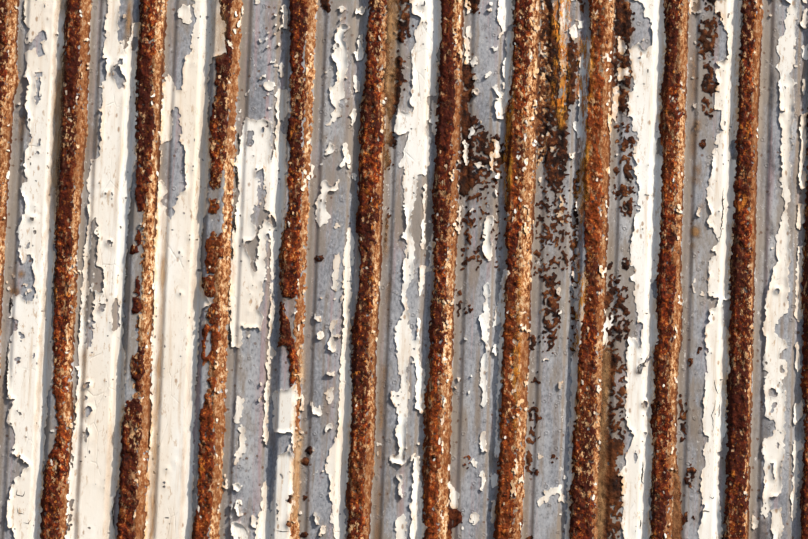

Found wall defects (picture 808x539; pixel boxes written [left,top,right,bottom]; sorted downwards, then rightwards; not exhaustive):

peeling [6,0,78,539]
corrosion [40,0,92,539]
corrosion [116,0,168,539]
peeling [65,0,366,539]
corrosion [345,0,414,539]
peeling [380,0,451,539]
corrosion [421,0,639,539]
peeling [601,0,674,539]
corrosion [649,0,723,539]
peeling [691,0,742,539]
corrosion [722,0,764,539]
peeling [751,0,808,539]